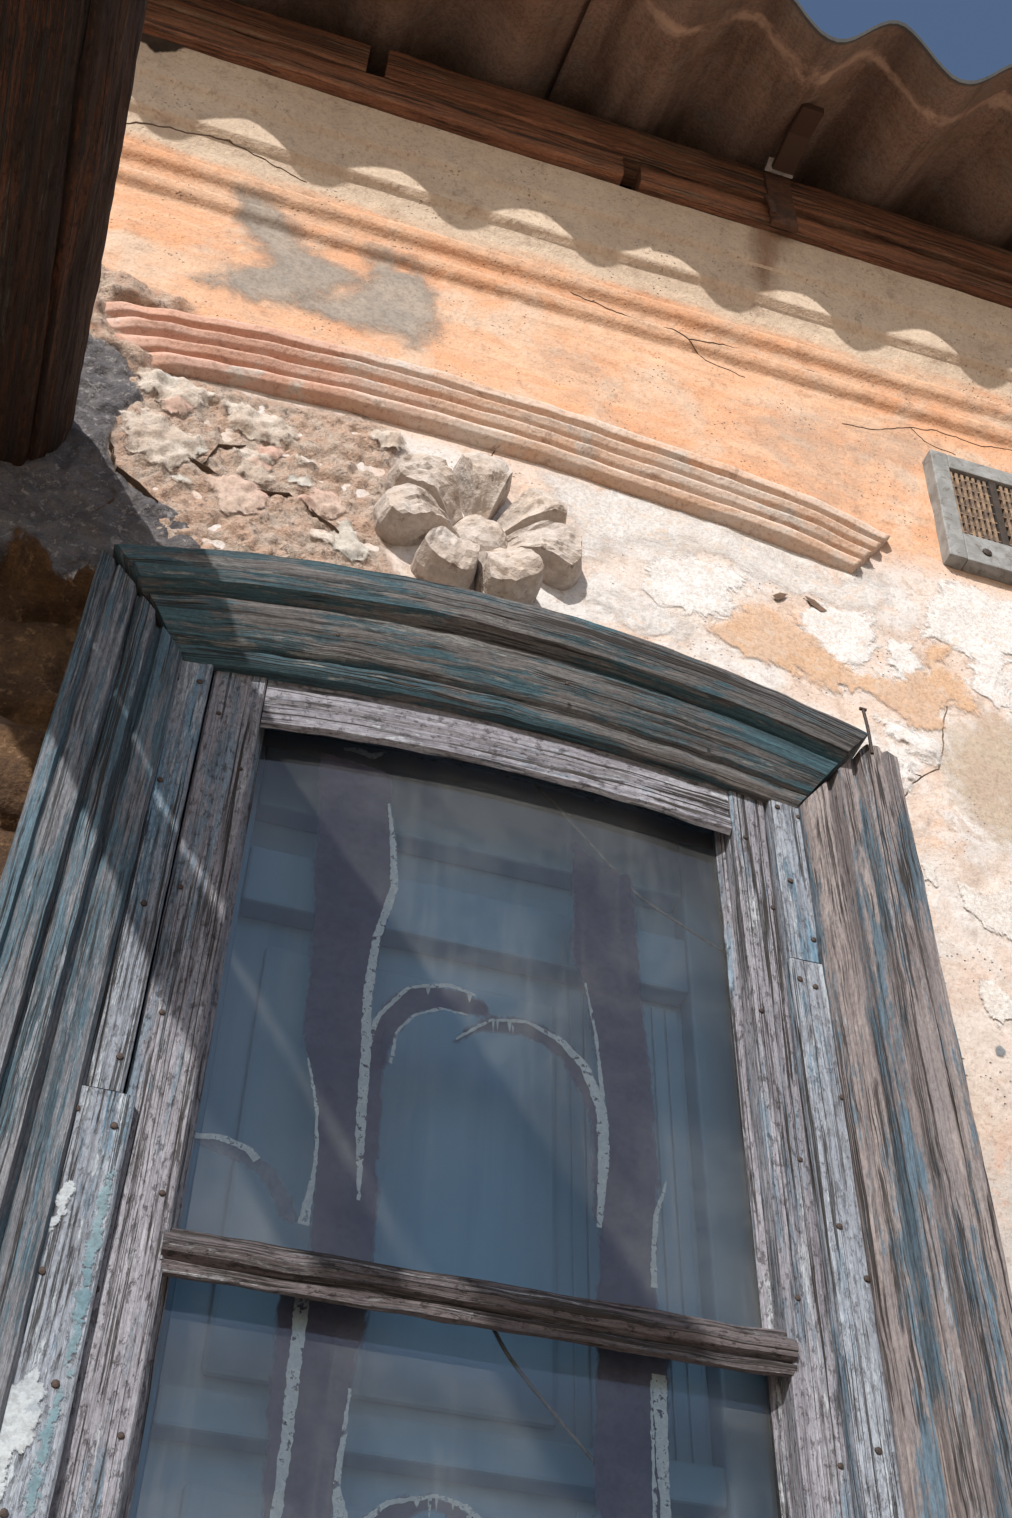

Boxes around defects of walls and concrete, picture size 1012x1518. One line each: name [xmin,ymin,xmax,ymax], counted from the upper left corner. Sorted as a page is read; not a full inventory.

crack [126,121,307,183]
crack [571,292,769,378]
spalling [89,265,407,574]
crack [842,423,1012,455]
peeling [543,472,1012,841]
crack [905,706,948,796]
peeling [978,979,1012,1028]